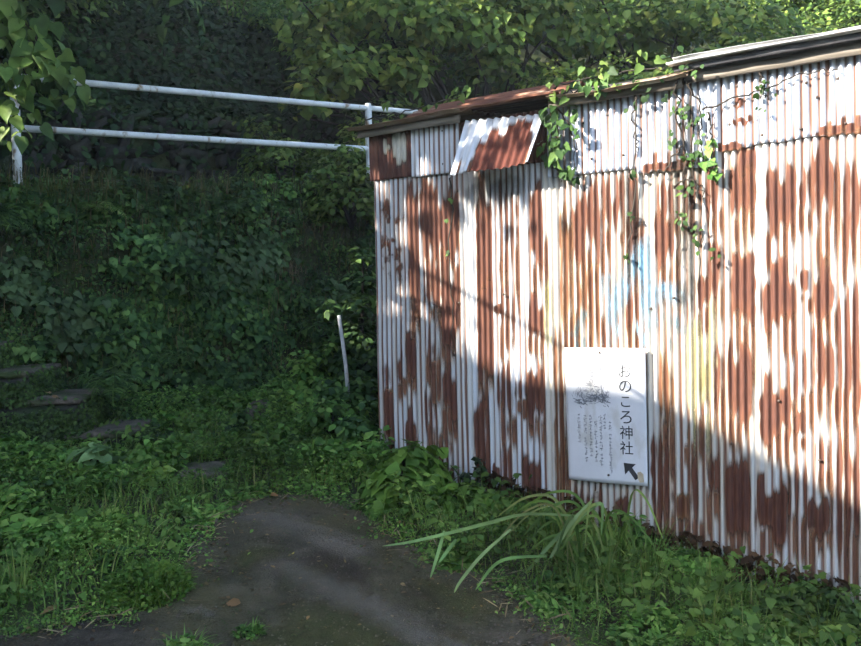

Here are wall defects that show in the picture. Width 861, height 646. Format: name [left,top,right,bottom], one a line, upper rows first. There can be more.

rust [732,97,757,126]
rust [381,176,461,483]
rust [456,114,861,600]